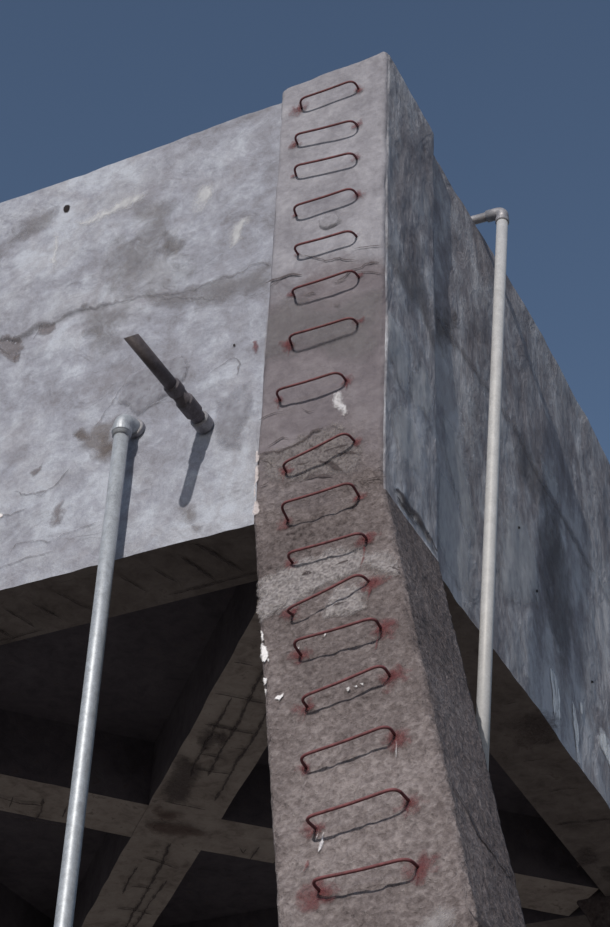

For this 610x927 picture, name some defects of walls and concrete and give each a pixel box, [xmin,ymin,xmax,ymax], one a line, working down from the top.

spalling [253,423,360,515]
spalling [257,549,399,618]
peeling [261,631,269,662]
water stain [521,668,560,744]
water stain [572,701,583,763]
efflorescence [598,728,610,764]